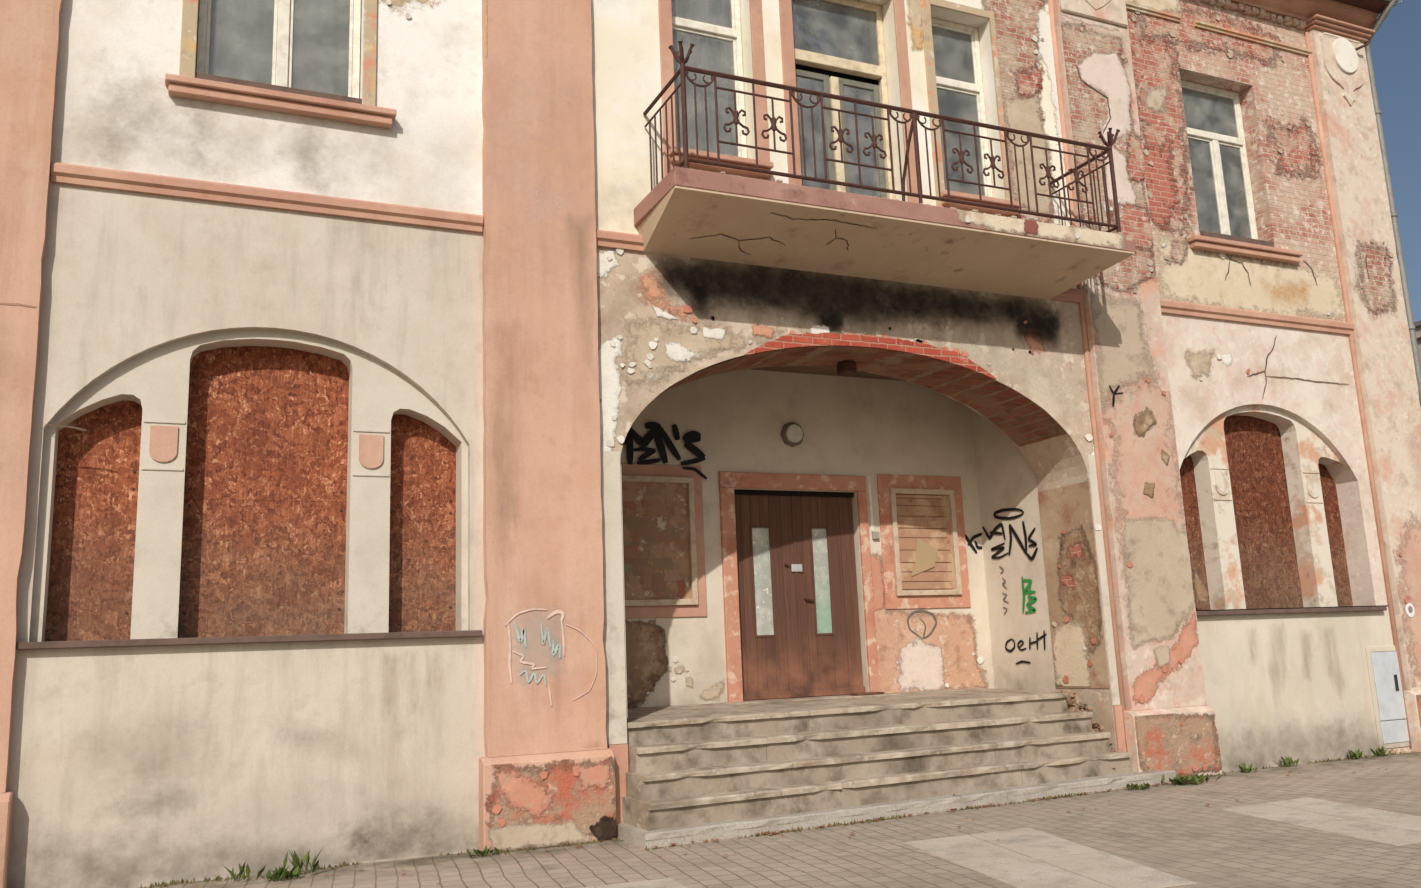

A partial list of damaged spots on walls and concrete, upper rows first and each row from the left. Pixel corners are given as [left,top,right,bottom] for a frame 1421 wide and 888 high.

flaking render [1258,113,1322,182]
crack [692,213,877,255]
leakage [692,286,707,311]
leakage [820,316,841,331]
flaking render [598,271,1067,451]
leakage [1017,317,1057,341]
flaking render [957,0,1285,666]
crack [1249,335,1344,396]
spalling [625,619,725,708]
flaking render [864,554,988,693]
spalling [1132,570,1222,777]
spalling [484,756,617,852]